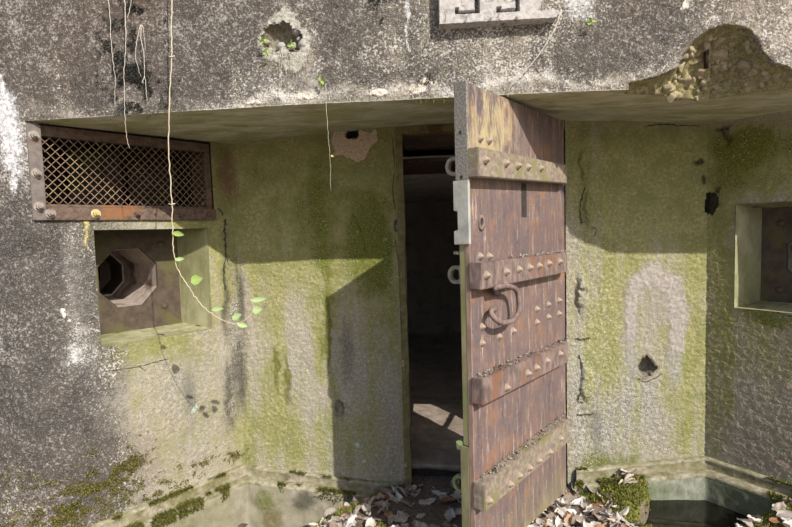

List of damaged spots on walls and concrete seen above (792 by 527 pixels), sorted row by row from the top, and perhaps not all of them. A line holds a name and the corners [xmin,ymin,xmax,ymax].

spalling [255,4,315,73]
spalling [624,23,792,104]
water stain [0,74,25,193]
peeling [332,129,378,163]
water stain [325,306,350,375]
water stain [273,350,292,401]